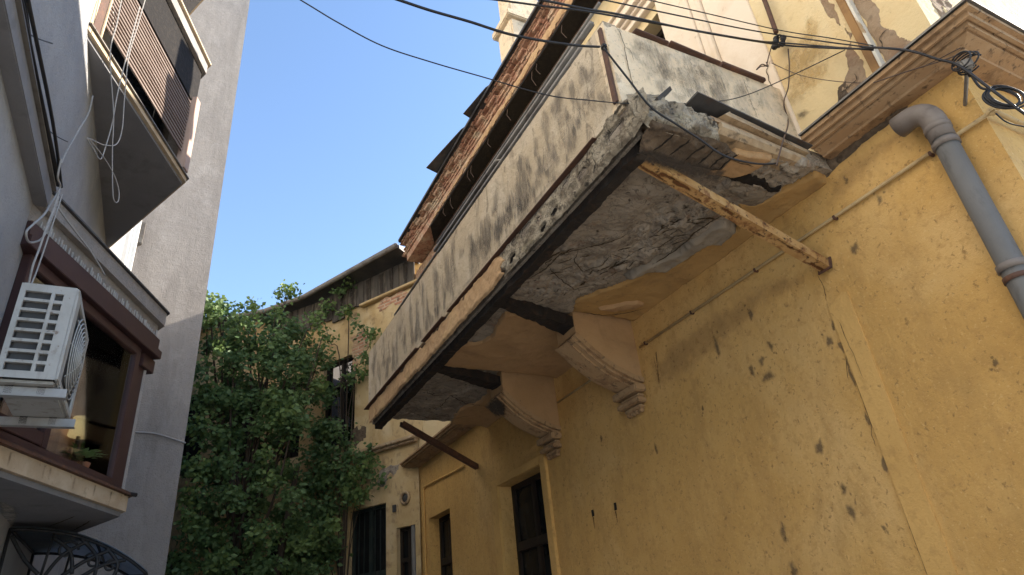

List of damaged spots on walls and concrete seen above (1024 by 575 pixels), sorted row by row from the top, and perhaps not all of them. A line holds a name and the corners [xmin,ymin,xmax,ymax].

peeling [820,0,867,101]
peeling [854,0,911,62]
peeling [931,0,953,17]
corrosion [640,165,701,202]
spalling [499,87,908,316]
spalling [392,373,487,422]
crack [819,279,887,471]